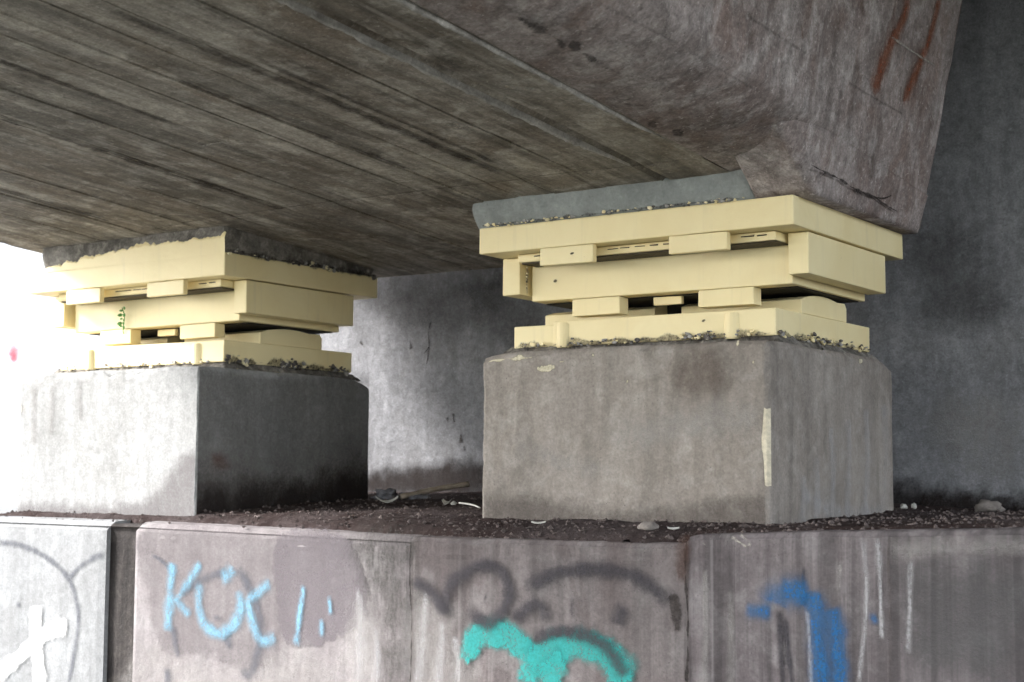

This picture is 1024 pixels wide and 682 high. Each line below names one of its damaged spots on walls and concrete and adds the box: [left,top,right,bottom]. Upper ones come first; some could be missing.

crack [812,165,896,211]
damp [865,544,883,636]